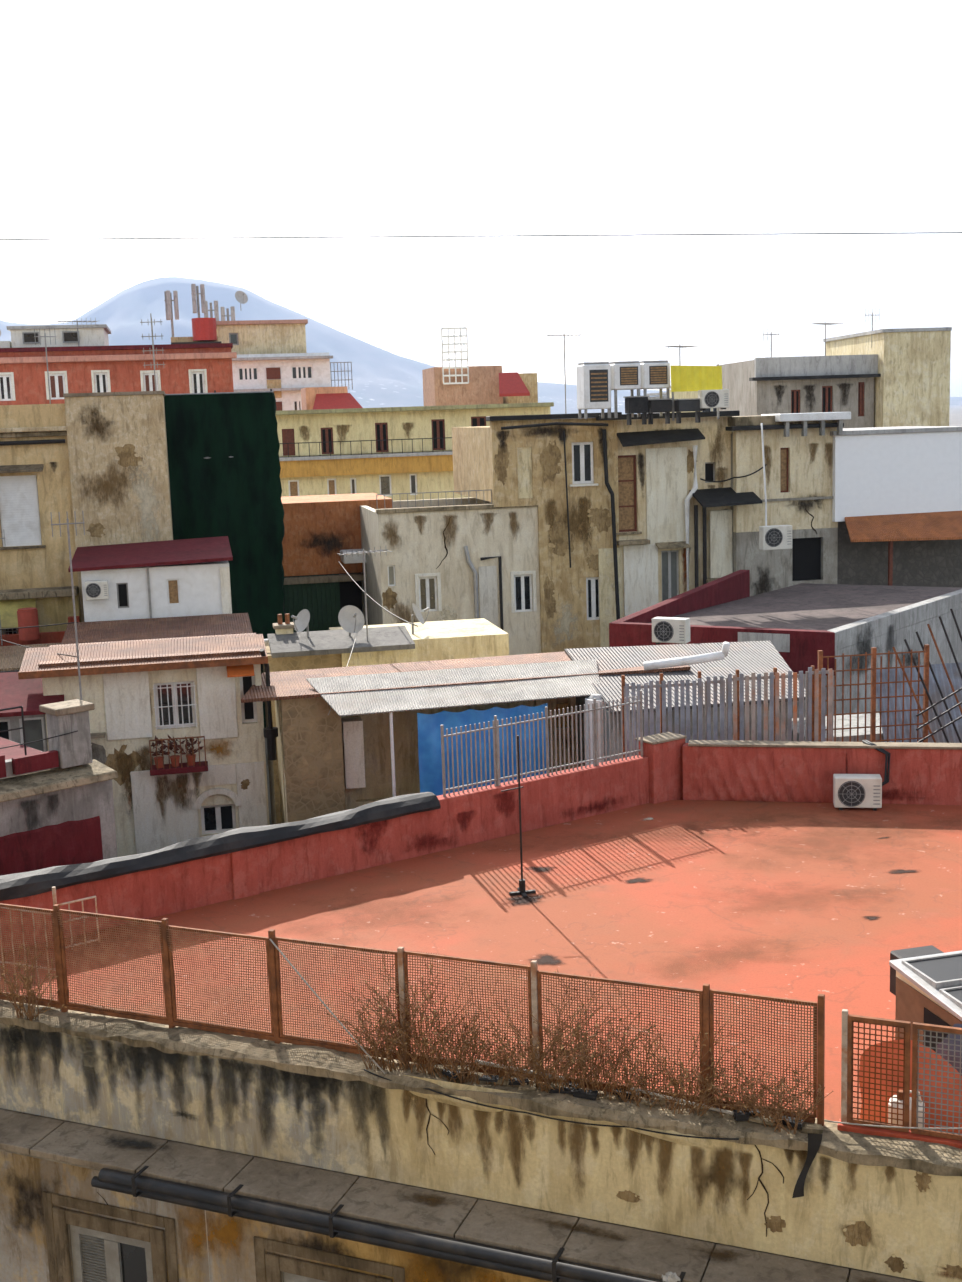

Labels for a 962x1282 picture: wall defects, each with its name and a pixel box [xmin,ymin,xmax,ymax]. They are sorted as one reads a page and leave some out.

leakage [83,409,110,435]
leakage [82,465,127,504]
leakage [546,498,591,543]
leakage [509,895,543,905]
leakage [530,955,562,965]
leakage [0,1020,387,1143]
leakage [403,1090,534,1185]
leakage [559,1121,672,1192]
leakage [691,1147,751,1198]
crack [747,1145,784,1237]
spalling [843,1220,871,1247]
spalling [884,1254,908,1273]